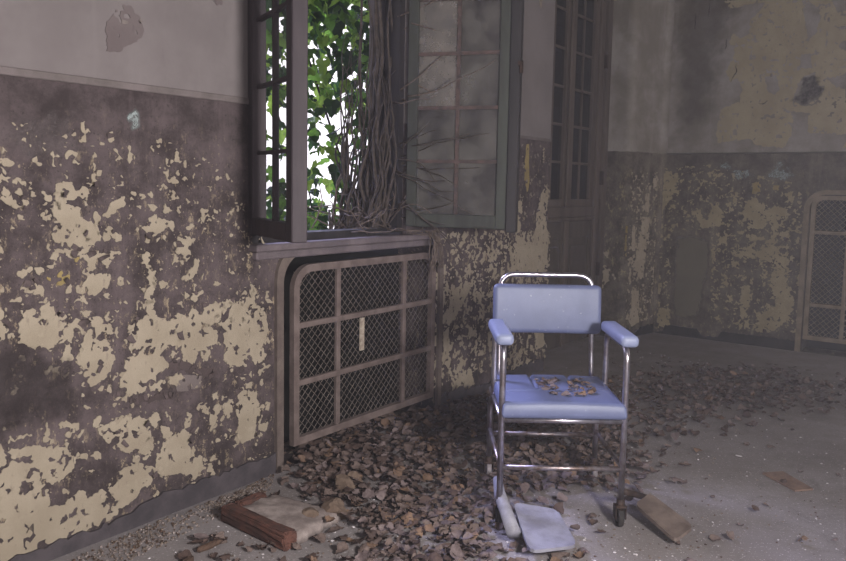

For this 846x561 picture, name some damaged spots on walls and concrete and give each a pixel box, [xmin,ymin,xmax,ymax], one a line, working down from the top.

peeling [0,121,274,561]
peeling [434,143,551,391]
peeling [624,164,803,333]